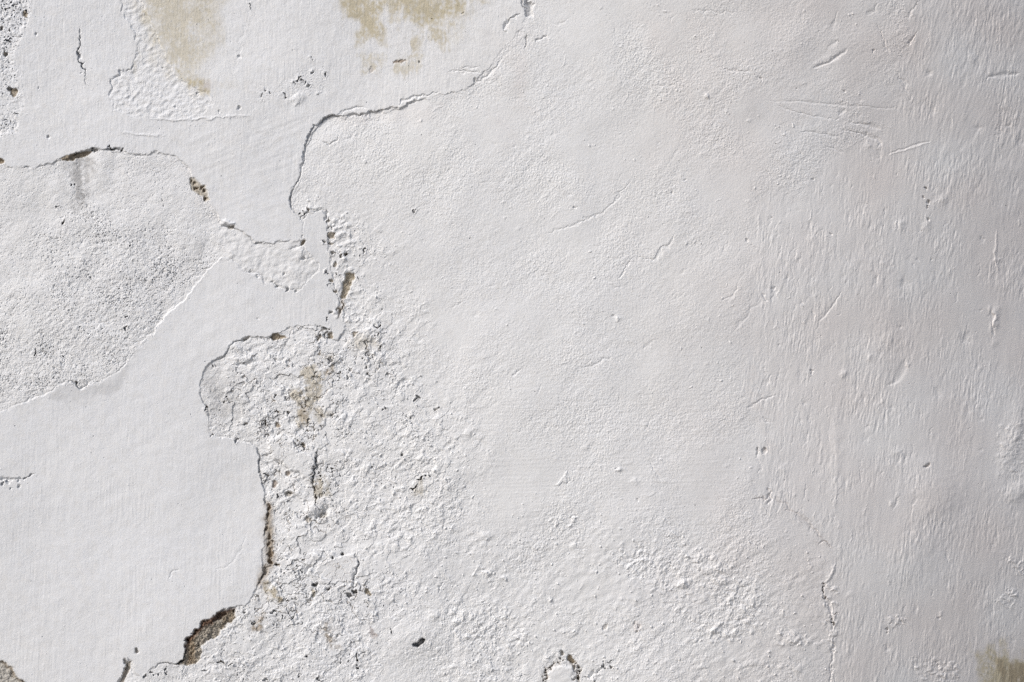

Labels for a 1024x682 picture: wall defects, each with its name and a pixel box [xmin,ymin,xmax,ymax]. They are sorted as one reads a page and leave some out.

spalling [0,0,33,139]
spalling [108,0,221,121]
damp [128,0,236,101]
crack [284,0,535,219]
damp [332,0,491,80]
spalling [0,145,495,682]